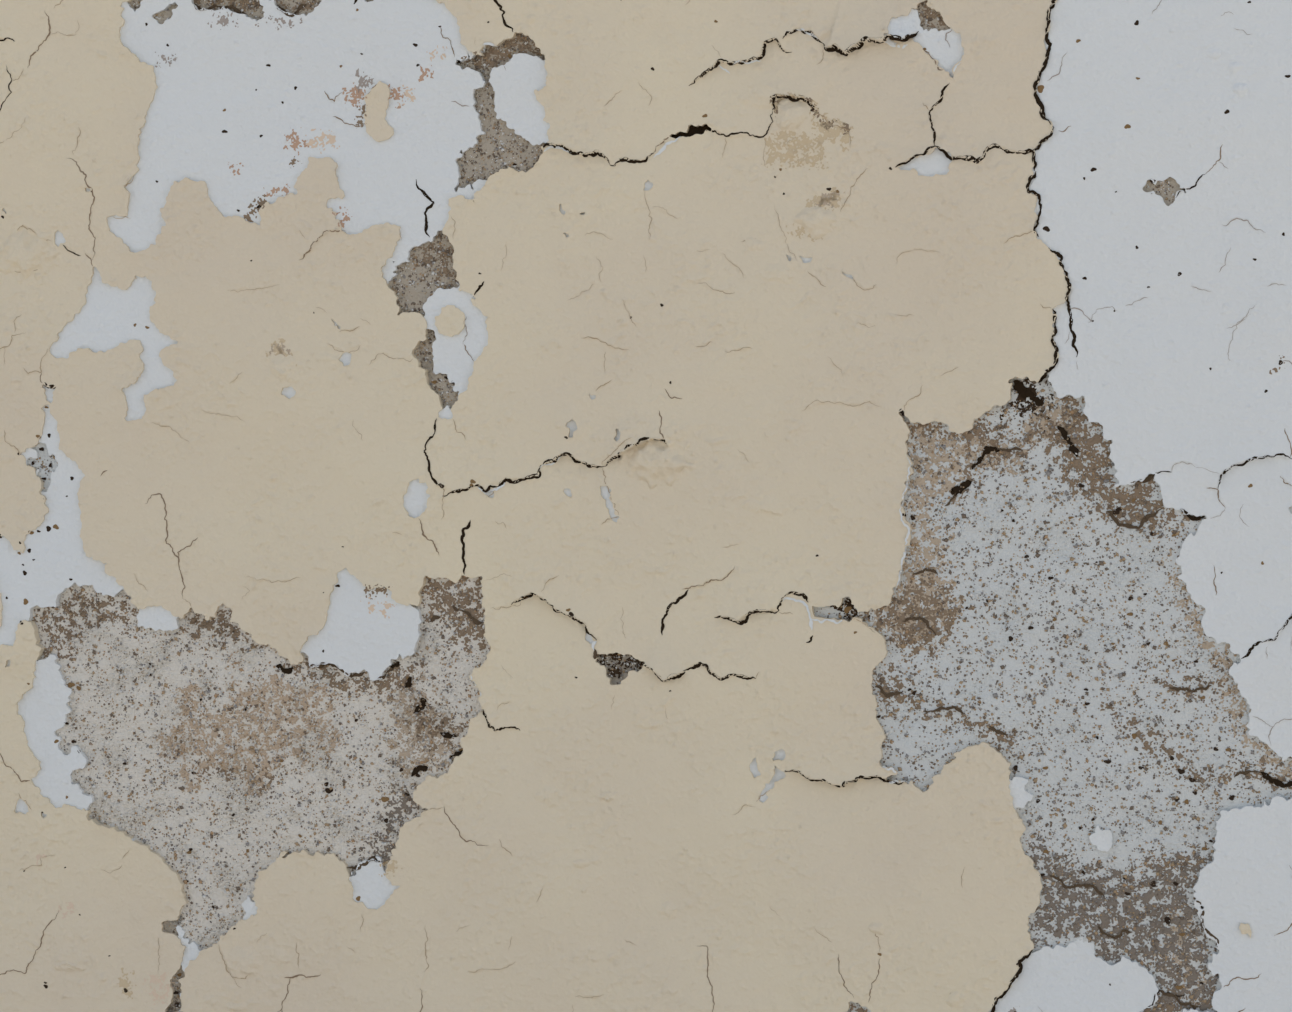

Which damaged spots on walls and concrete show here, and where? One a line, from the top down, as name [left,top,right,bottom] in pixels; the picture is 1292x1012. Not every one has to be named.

peeling [107,0,550,419]
peeling [50,267,178,421]
crack [463,250,507,361]
crack [945,446,1022,506]
peeling [813,0,1292,1012]
crack [661,544,738,634]
crack [715,591,813,643]
crack [850,616,936,636]
spalling [0,382,491,1012]
crack [644,662,759,719]